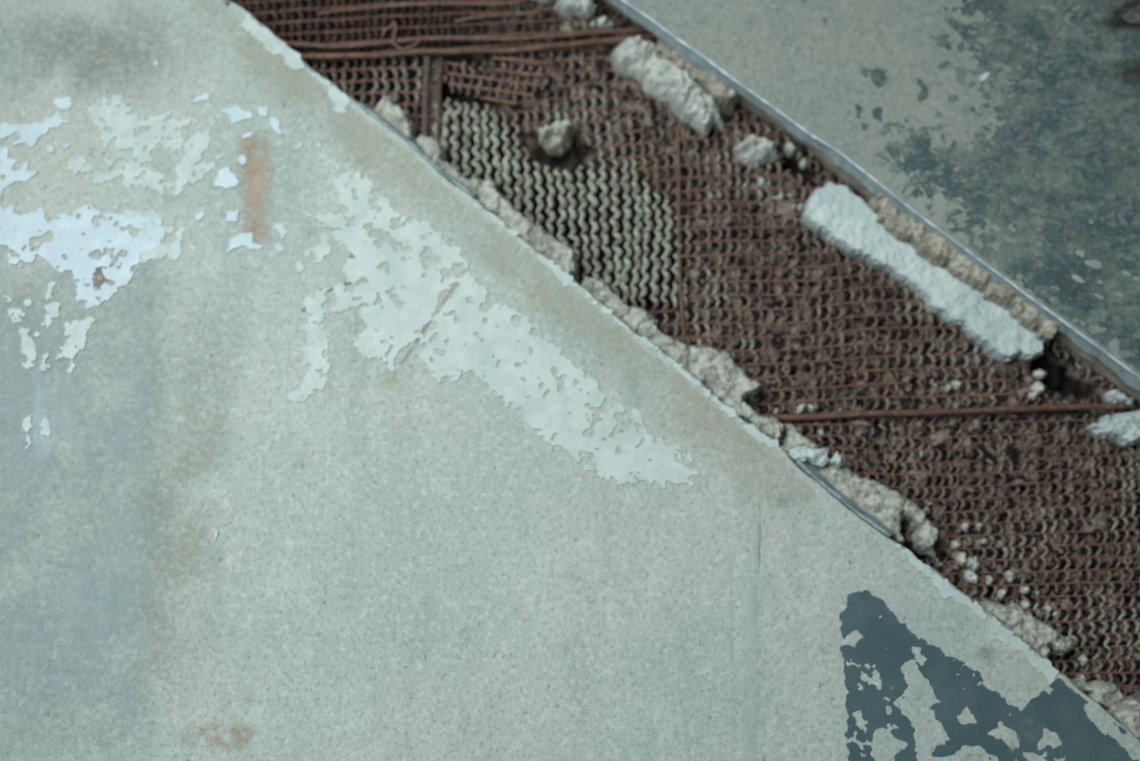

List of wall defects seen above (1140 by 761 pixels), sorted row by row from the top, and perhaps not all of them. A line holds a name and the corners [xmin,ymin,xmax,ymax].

peeling [22,415,51,450]
peeling [0,93,247,373]
peeling [221,106,282,139]
spalling [226,0,640,70]
peeling [226,137,699,489]
spalling [306,0,1140,761]